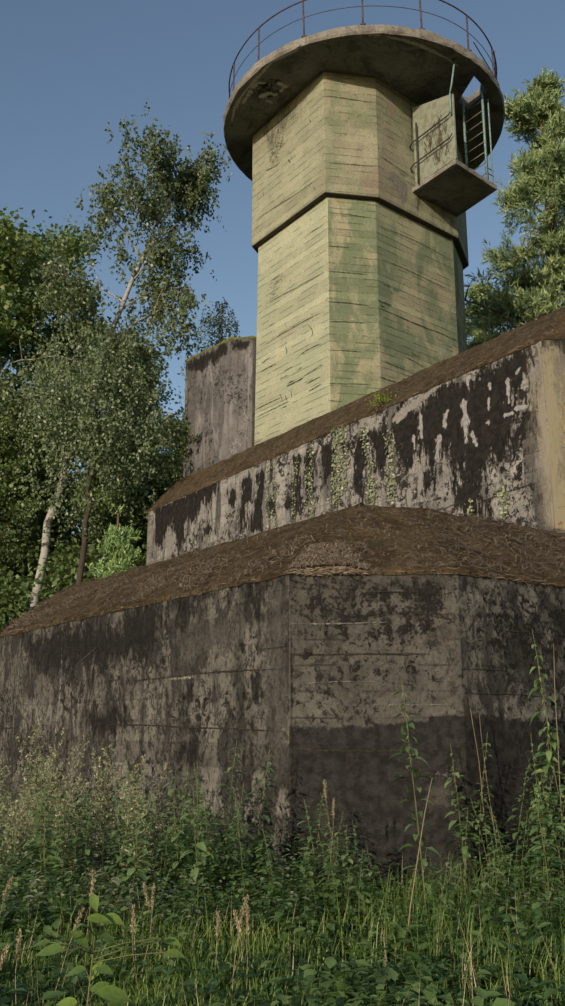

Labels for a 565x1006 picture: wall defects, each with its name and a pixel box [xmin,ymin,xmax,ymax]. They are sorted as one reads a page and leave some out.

damp [153,339,565,555]
damp [4,595,237,747]
damp [243,579,565,889]